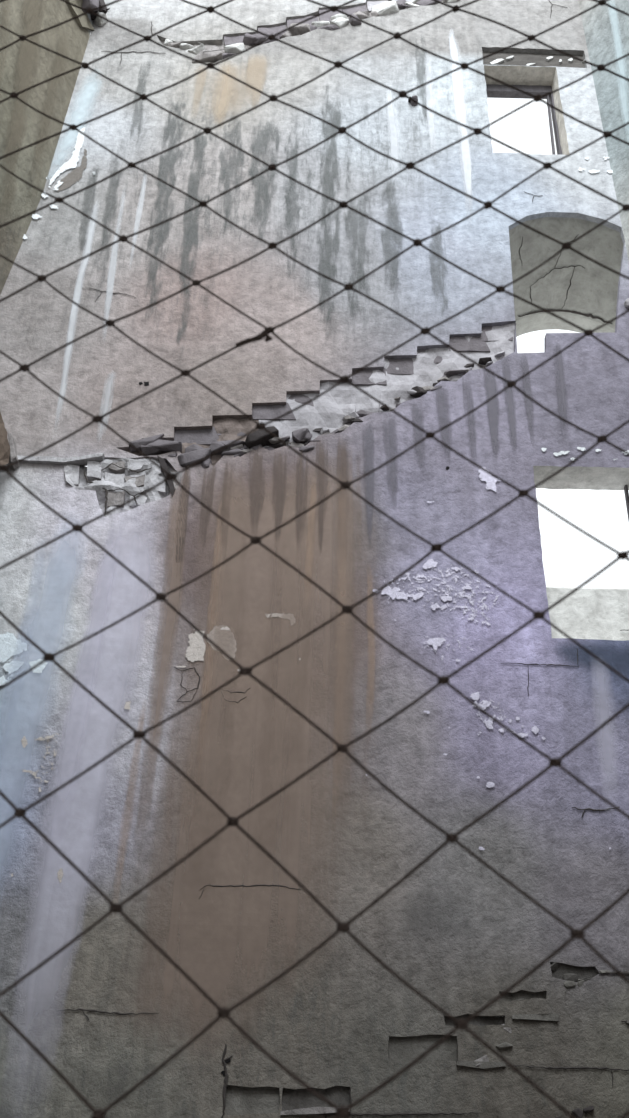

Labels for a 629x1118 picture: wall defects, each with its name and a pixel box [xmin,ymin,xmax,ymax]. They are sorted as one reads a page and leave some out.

damp [450,36,471,195]
damp [59,221,94,404]
damp [134,105,185,302]
damp [180,136,207,292]
damp [319,104,341,321]
crack [518,234,613,324]
peeling [479,467,500,492]
peeling [0,632,47,686]
damp [0,556,71,843]
damp [34,547,145,968]
peeling [373,559,500,661]
crack [221,1044,233,1118]